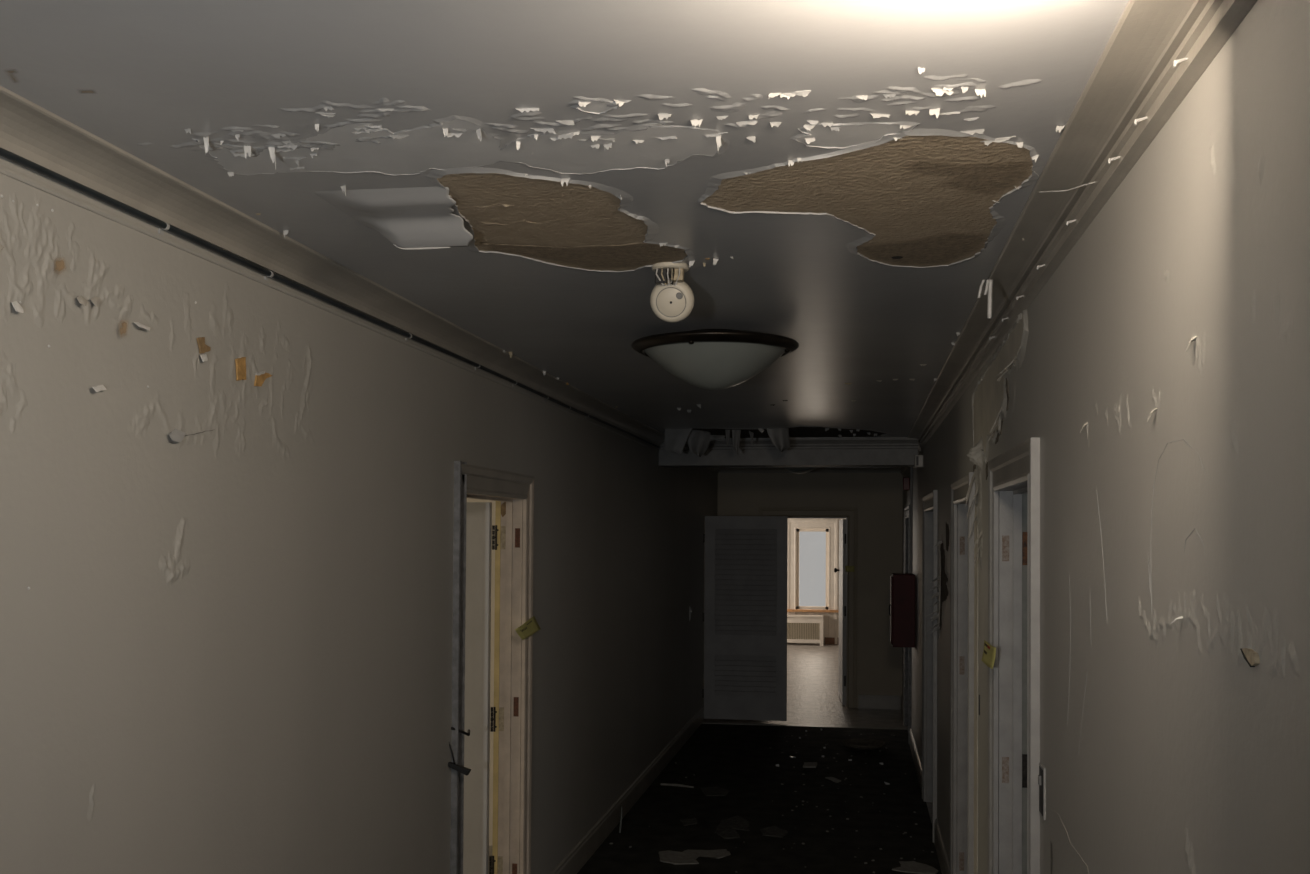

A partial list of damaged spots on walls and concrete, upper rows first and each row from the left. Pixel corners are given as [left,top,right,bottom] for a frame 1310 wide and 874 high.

peeling [137,67,1045,272]
peeling [977,279,993,319]
peeling [196,337,211,354]
peeling [235,357,273,387]
peeling [965,309,1029,874]